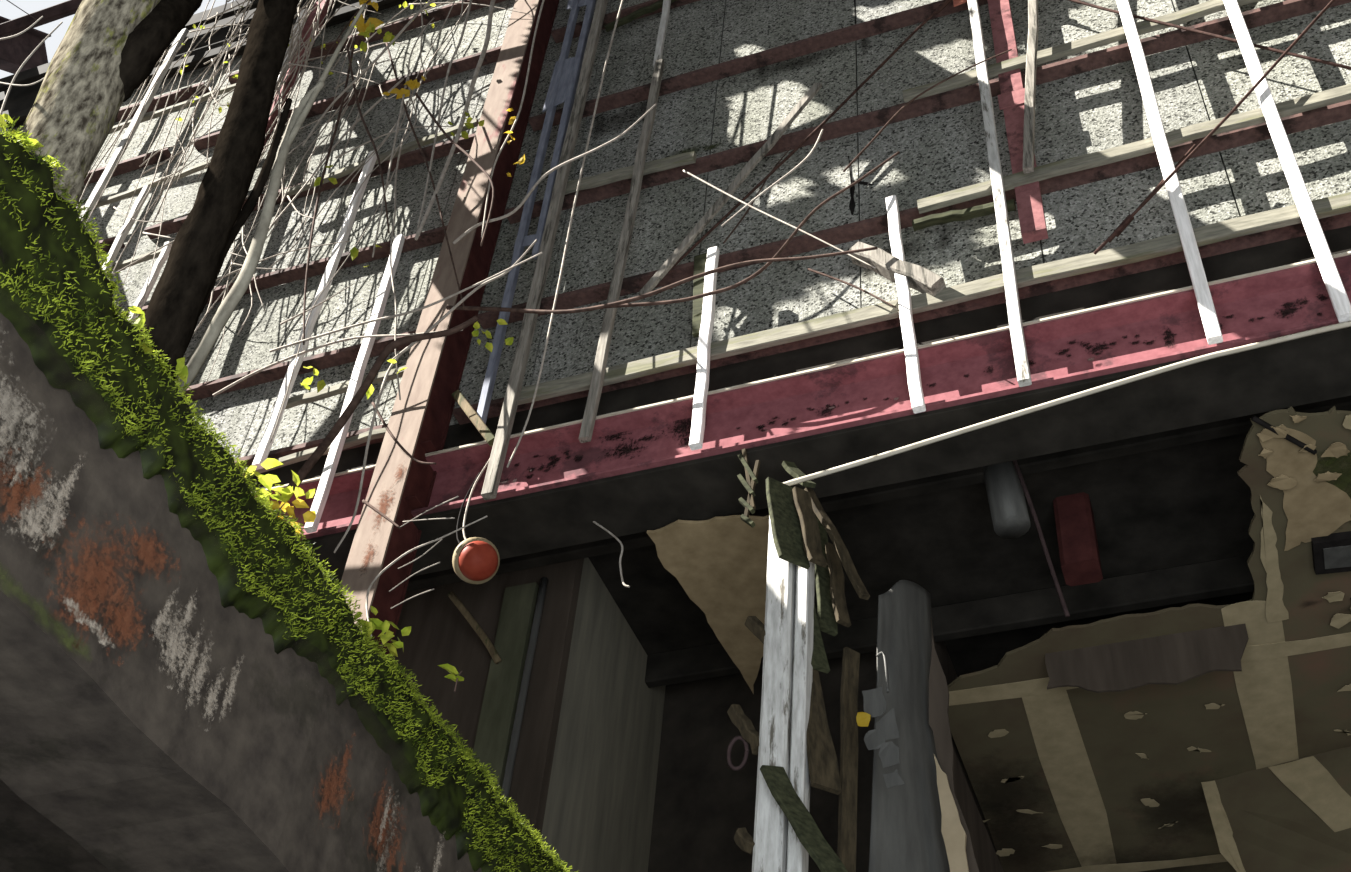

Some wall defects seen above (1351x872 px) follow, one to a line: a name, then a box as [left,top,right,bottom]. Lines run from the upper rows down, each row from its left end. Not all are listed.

flaking render [1257,415,1351,623]
damp [152,592,244,720]
flaking render [1322,591,1351,629]